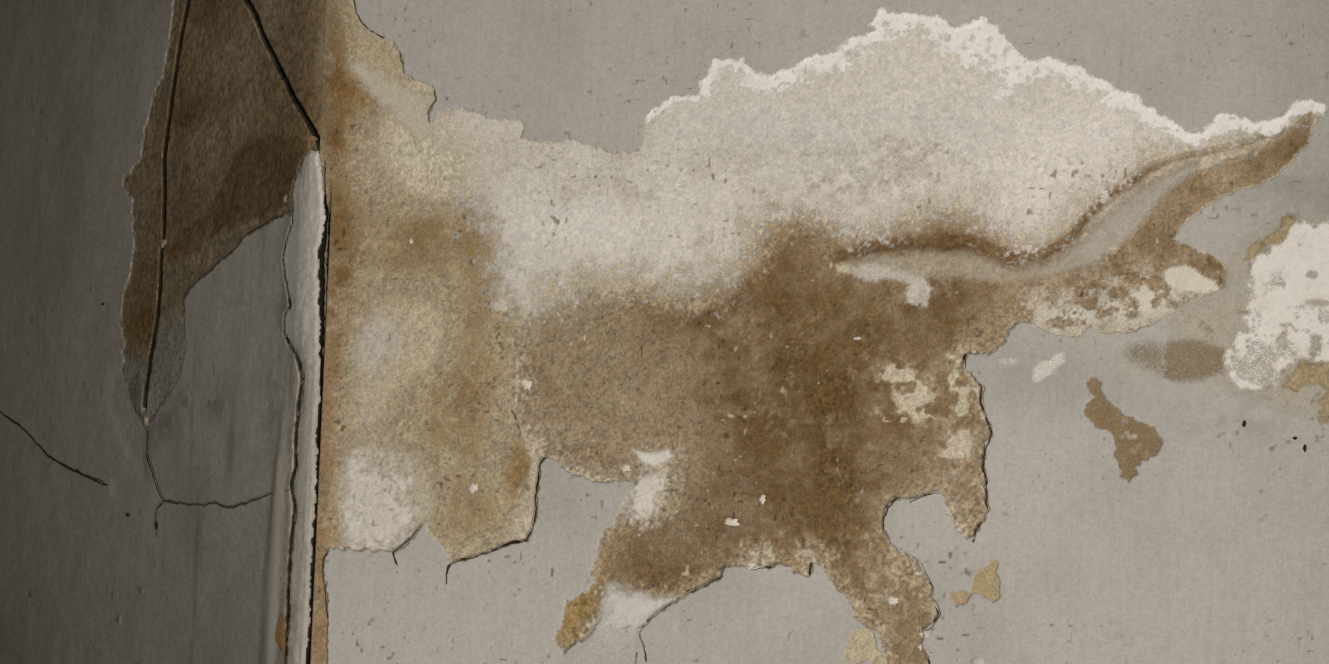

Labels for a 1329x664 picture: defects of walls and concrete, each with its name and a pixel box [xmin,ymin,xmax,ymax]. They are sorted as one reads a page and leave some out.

crack [0,411,108,486]
water stain [122,0,327,362]
spalling [122,0,456,664]
water stain [308,0,1327,664]
spalling [346,0,1329,664]